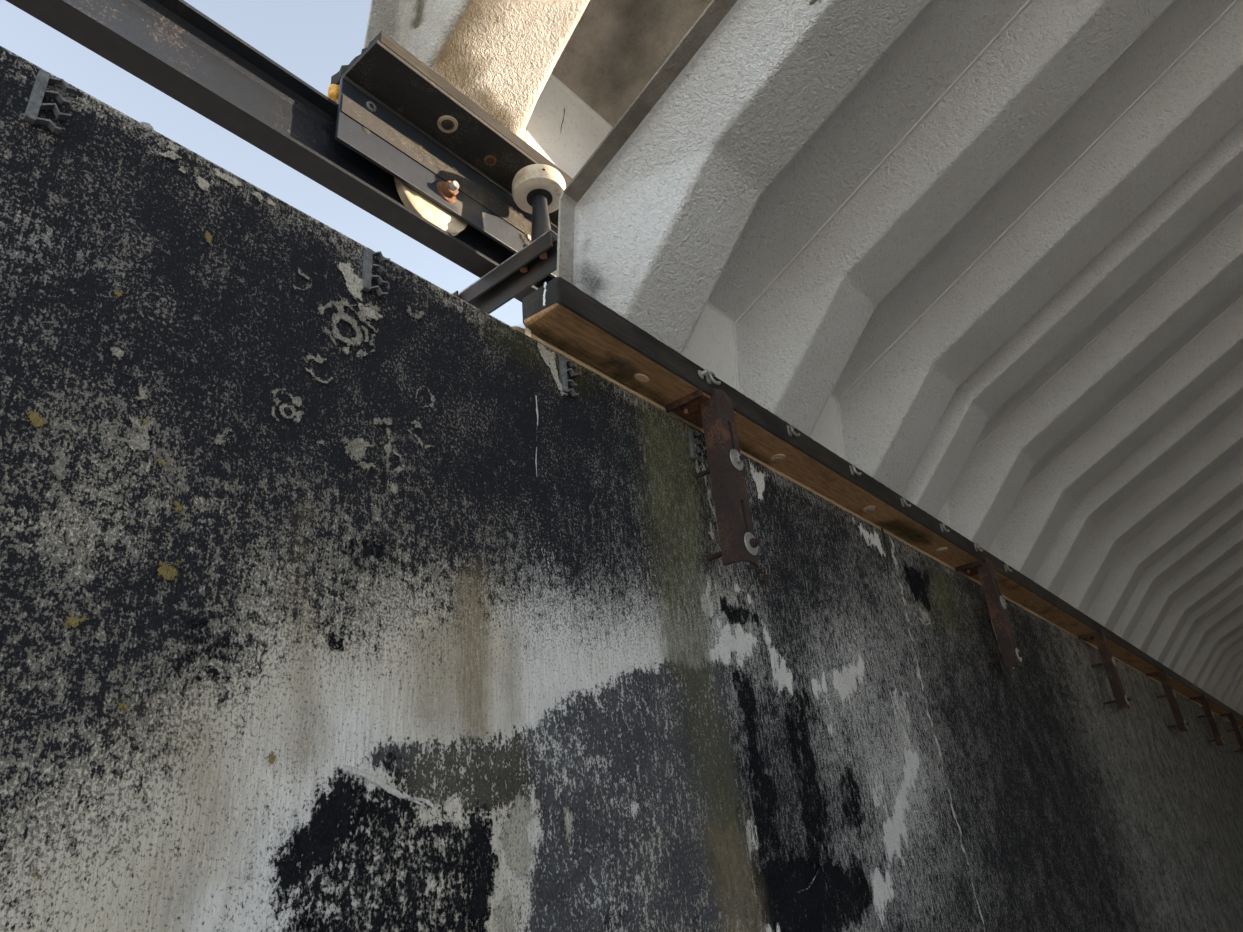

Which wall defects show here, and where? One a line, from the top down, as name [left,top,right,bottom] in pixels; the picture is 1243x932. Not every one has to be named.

water stain [451,0,487,44]
water stain [579,264,602,292]
water stain [903,561,933,623]
water stain [164,612,243,699]
water stain [261,445,921,932]